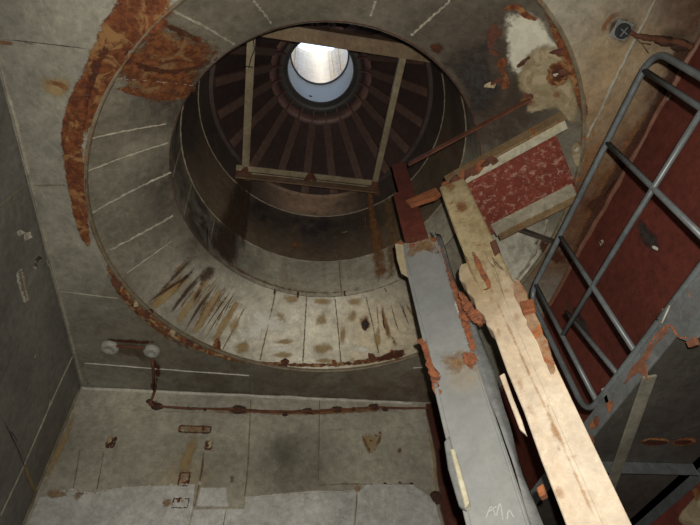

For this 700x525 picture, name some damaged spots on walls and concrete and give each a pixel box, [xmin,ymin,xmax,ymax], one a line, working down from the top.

peeling [484,4,588,124]
corrosion [45,0,218,246]
corrosion [105,261,247,363]
leakage [231,306,293,357]
leakage [315,345,331,363]
corrosion [256,309,406,367]
corrosion [365,193,486,369]